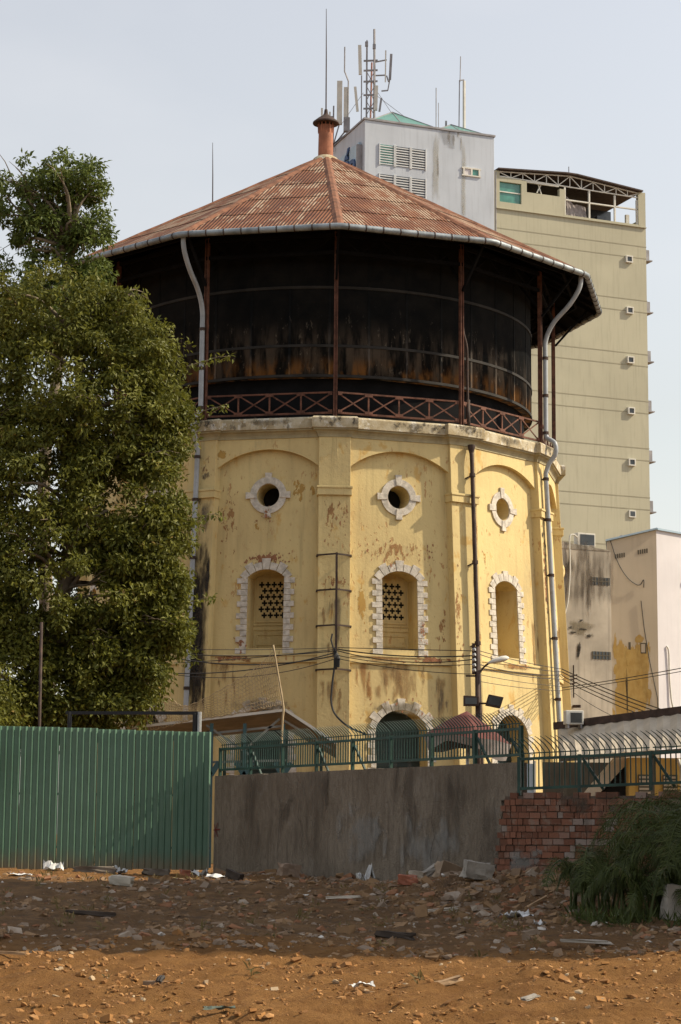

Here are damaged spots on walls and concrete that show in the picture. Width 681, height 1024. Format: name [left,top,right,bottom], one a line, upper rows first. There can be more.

spalling [288,480,349,546]
peeling [240,552,295,566]
peeling [360,539,434,569]
water stain [189,545,210,709]
water stain [569,620,591,638]
peeling [612,635,652,715]